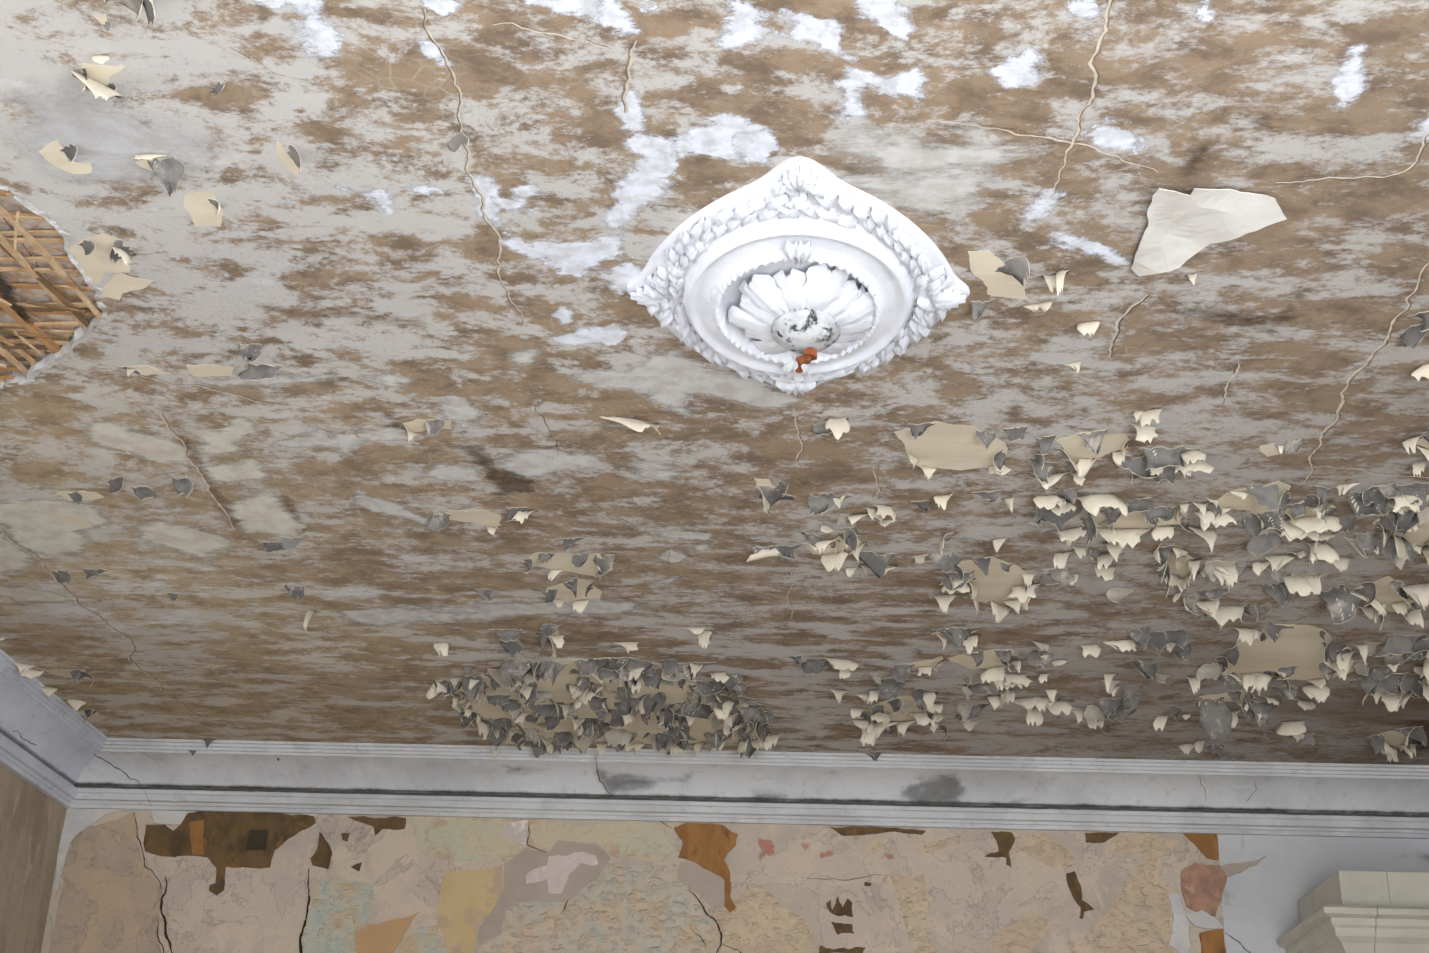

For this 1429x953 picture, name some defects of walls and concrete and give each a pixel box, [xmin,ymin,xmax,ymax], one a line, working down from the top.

water stain [524,0,658,36]
water stain [714,0,1048,212]
water stain [465,90,780,295]
peeling [0,186,153,389]
peeling [968,250,1070,322]
water stain [572,351,800,418]
water stain [85,417,307,565]
peeling [424,538,782,759]
peeling [746,408,1429,762]
crack [299,869,310,953]
crack [688,889,741,953]
spalling [819,897,865,953]